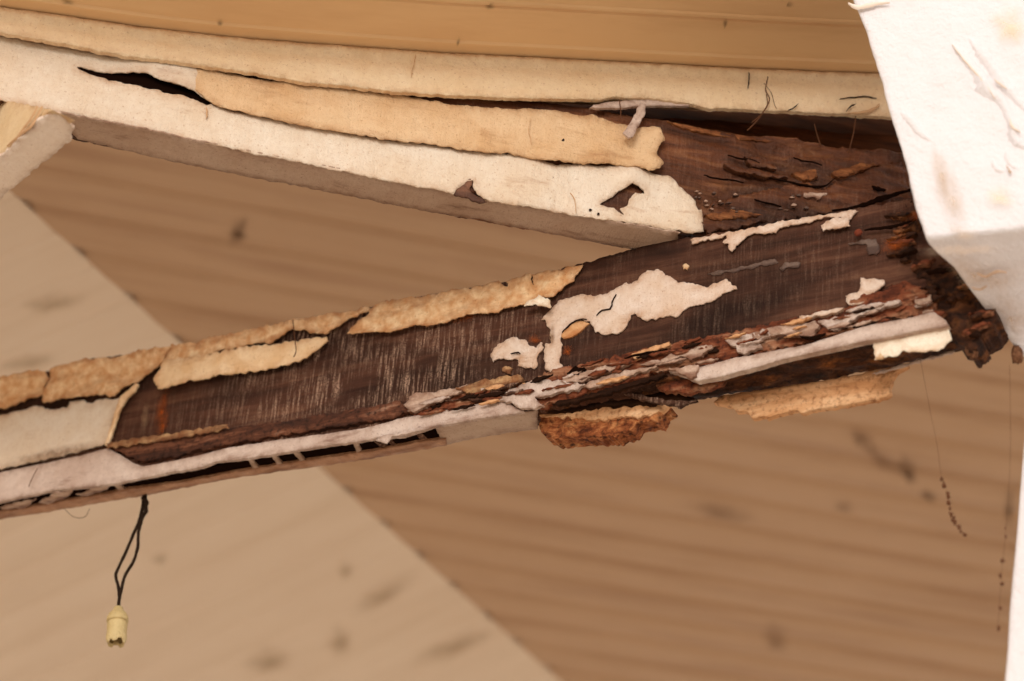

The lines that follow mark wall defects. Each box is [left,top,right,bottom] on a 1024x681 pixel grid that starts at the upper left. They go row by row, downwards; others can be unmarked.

peeling [0,35,858,252]
crack [704,155,917,231]
peeling [848,239,880,256]
peeling [0,259,801,470]
peeling [725,277,933,356]
peeling [873,329,952,360]